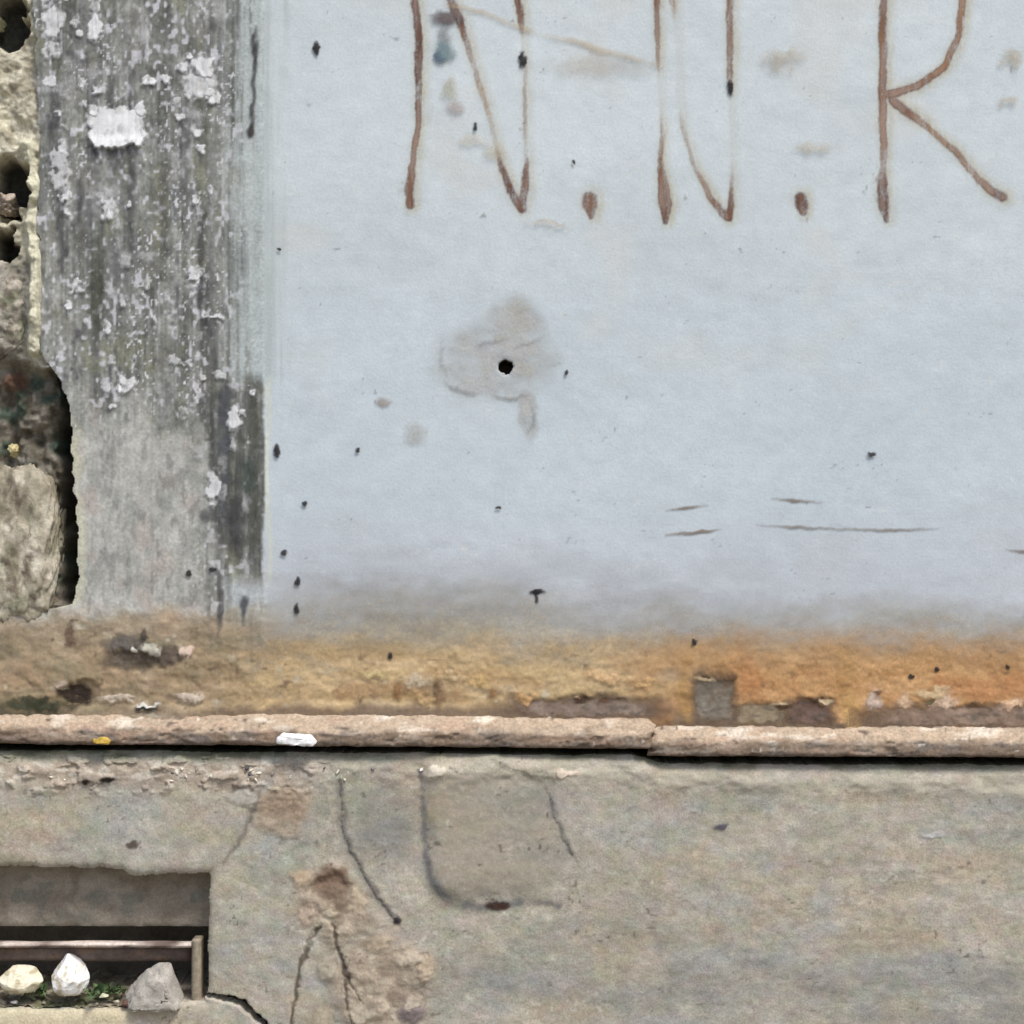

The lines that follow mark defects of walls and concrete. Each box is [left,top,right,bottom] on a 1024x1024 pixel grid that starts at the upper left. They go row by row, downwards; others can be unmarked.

peeling [42,0,103,59]
peeling [80,78,147,149]
peeling [141,52,221,154]
peeling [47,110,72,216]
peeling [96,187,131,229]
peeling [101,354,137,409]
peeling [226,405,245,450]
peeling [204,471,226,506]
water stain [200,382,263,560]
spalling [292,867,368,925]
crack [341,824,394,919]
crack [208,926,361,1024]